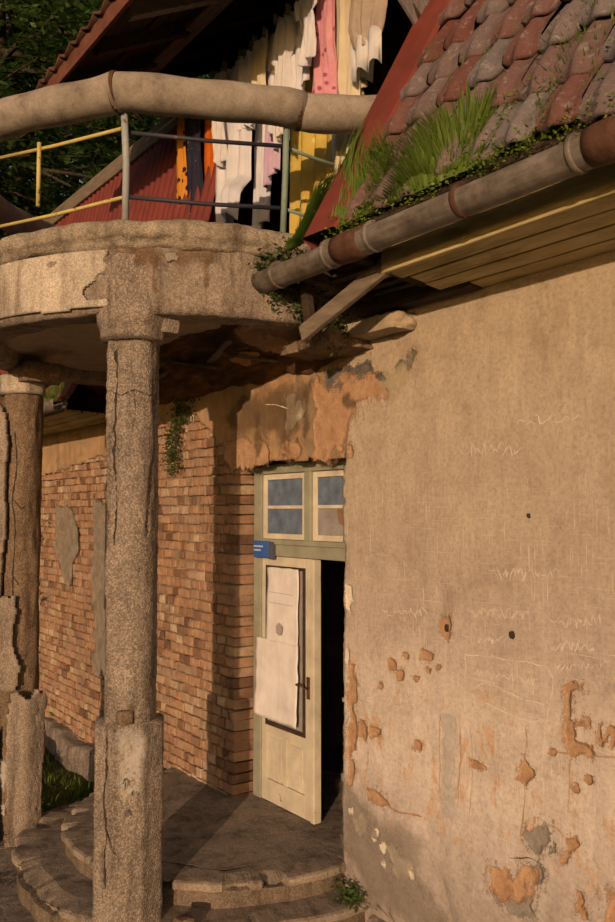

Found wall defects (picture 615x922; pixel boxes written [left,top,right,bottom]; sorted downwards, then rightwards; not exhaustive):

peeling [222,359,389,476]
crack [111,349,153,543]
peeling [344,582,355,616]
peeling [439,610,453,643]
peeling [343,647,382,789]
peeling [468,757,487,772]
peeling [570,774,595,795]
peeling [366,788,422,817]
peeling [484,726,581,921]